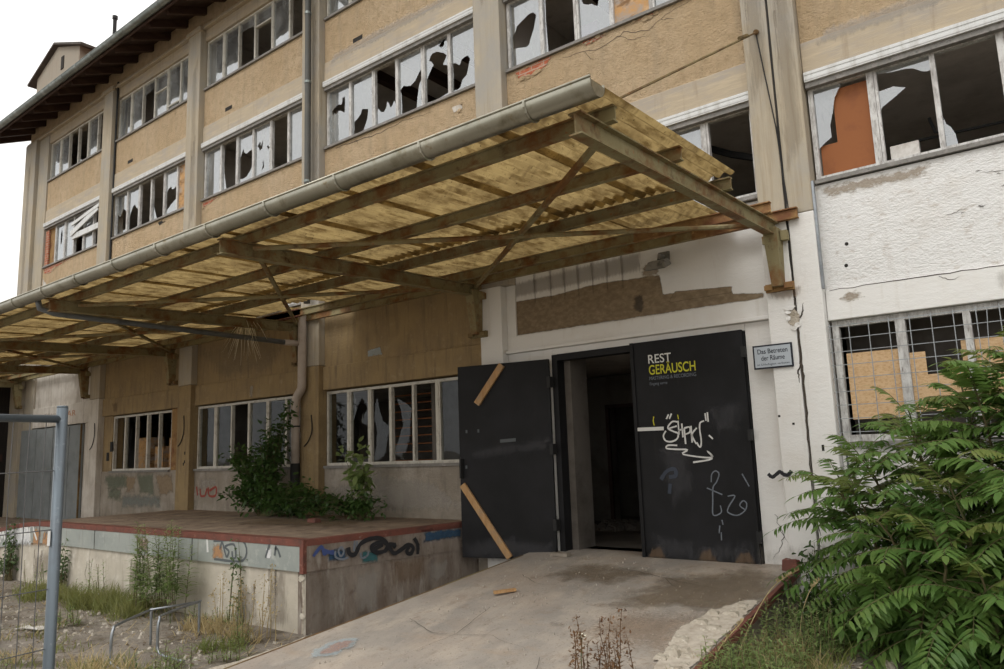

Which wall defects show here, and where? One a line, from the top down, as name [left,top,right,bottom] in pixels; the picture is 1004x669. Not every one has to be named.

peeling [516,276,764,335]